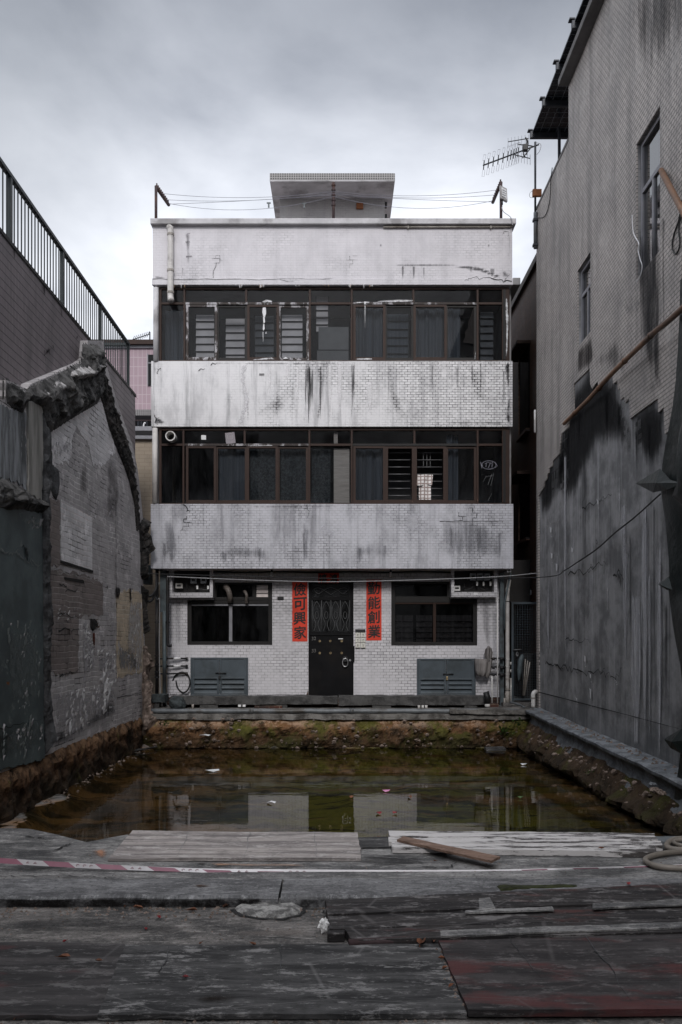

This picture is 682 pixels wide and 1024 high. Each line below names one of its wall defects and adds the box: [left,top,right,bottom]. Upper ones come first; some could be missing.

water stain [305,369,321,421]
crack [440,508,500,526]
water stain [541,343,662,648]